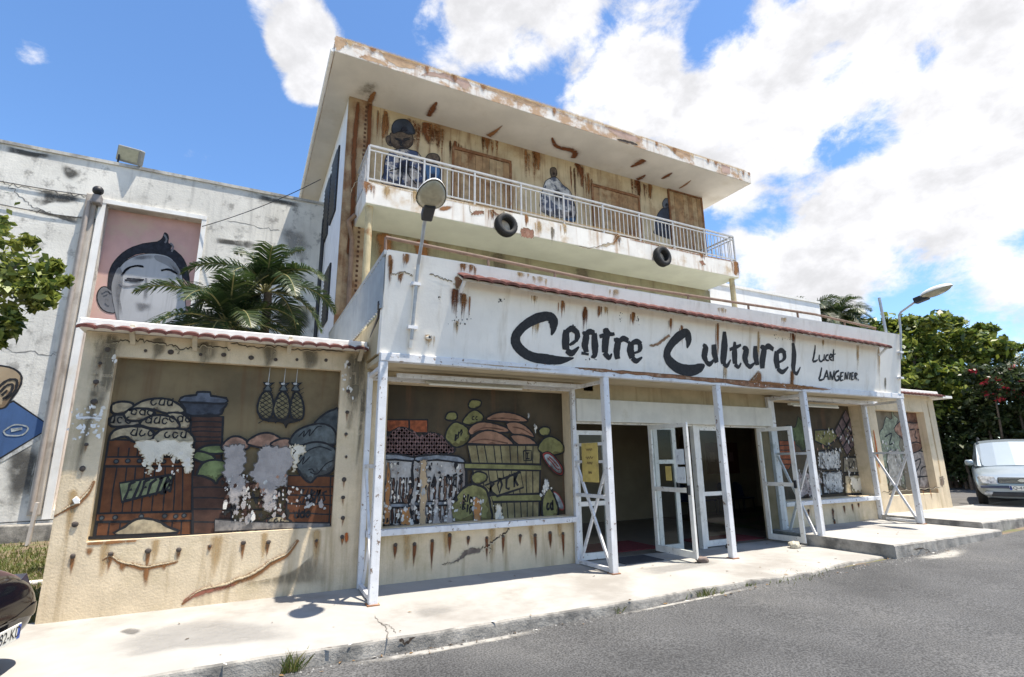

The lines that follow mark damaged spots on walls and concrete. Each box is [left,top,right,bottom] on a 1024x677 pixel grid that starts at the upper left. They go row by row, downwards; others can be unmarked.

corrosion [347,91,417,292]